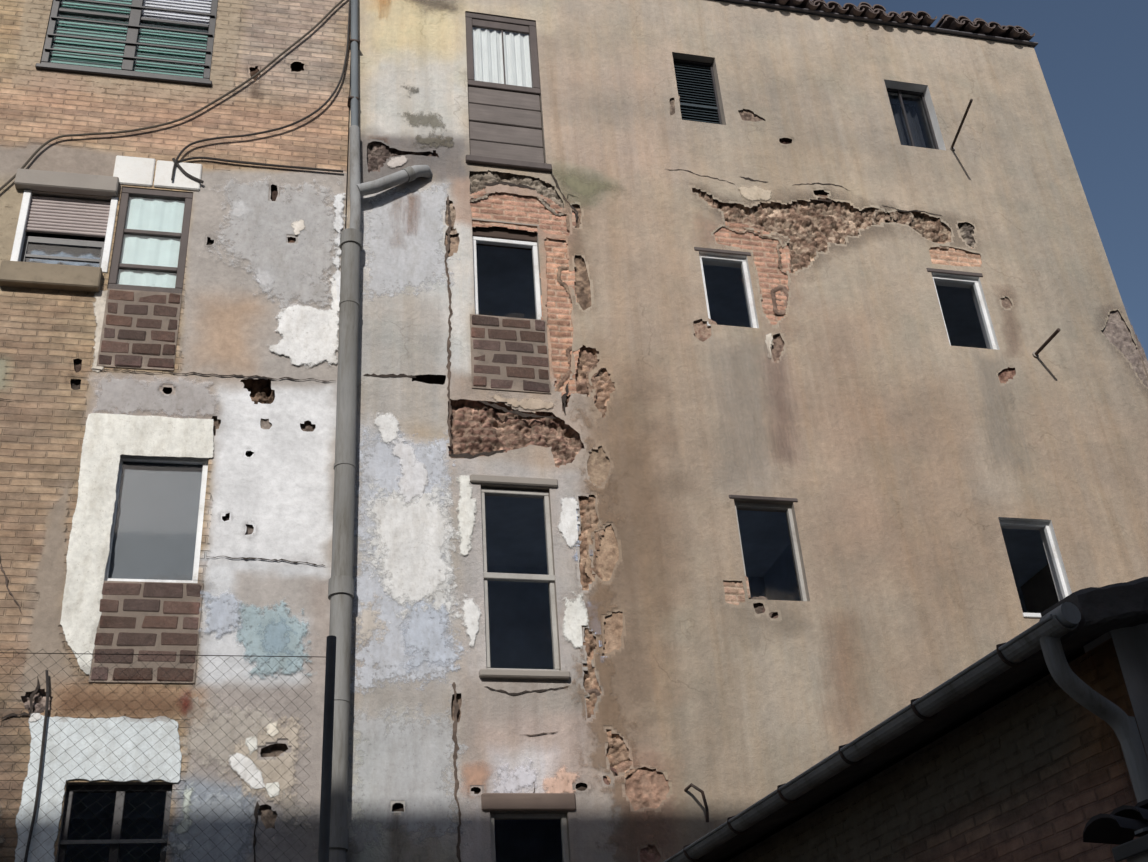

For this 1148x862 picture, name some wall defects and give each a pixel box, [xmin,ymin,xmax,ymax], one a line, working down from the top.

flaking render [367,141,439,173]
peeling [218,180,346,367]
crack [444,194,460,447]
flaking render [692,185,982,363]
flaking render [1101,310,1148,387]
peeling [350,183,623,718]
crack [0,562,22,613]
peeling [200,591,311,679]
peeling [169,716,307,862]
crack [452,682,461,862]
peeling [347,693,579,852]
flaking render [603,729,669,862]